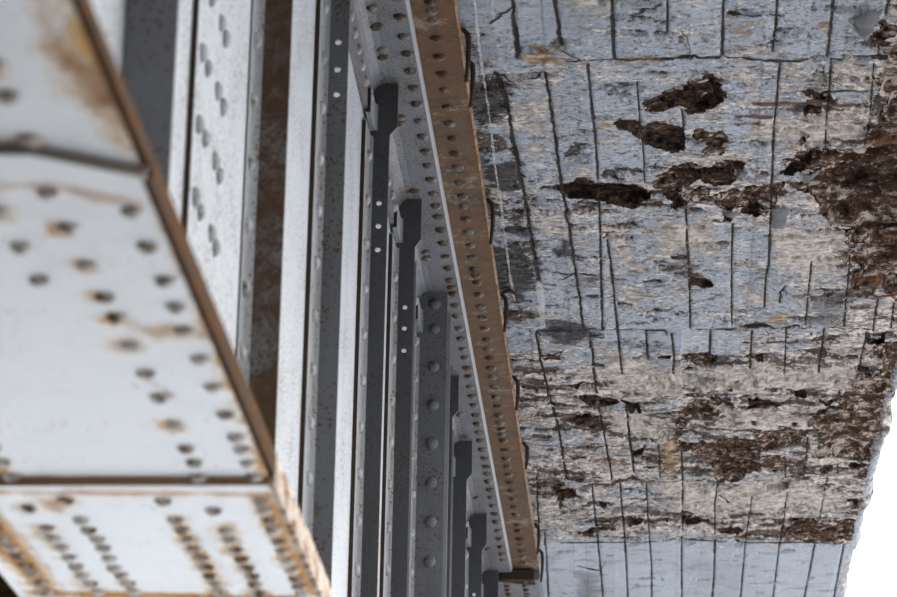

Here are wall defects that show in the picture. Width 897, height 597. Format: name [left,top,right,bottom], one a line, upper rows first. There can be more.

crack [727,11,786,27]
rust [38,0,135,151]
spalling [554,22,897,301]
crack [489,0,732,514]
spalling [538,348,563,361]
crack [696,324,875,340]
rust [240,417,269,477]
peeling [569,332,897,544]
rust [0,516,254,597]
rust [250,493,316,597]
spalling [532,483,584,550]
crack [534,476,842,597]